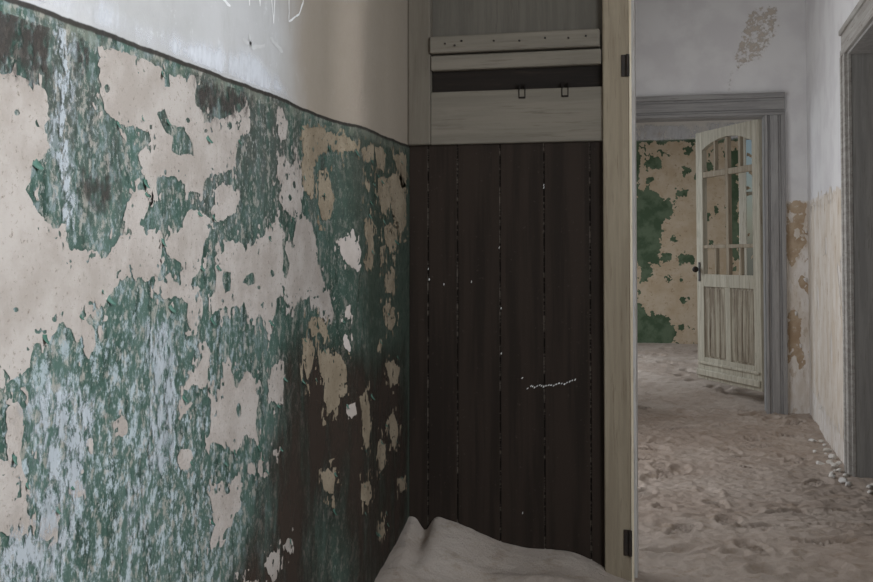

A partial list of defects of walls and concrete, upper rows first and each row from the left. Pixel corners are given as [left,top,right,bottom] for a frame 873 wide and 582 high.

peeling [0,46,408,556]
peeling [636,132,752,344]
peeling [786,186,844,442]
peeling [235,528,294,582]